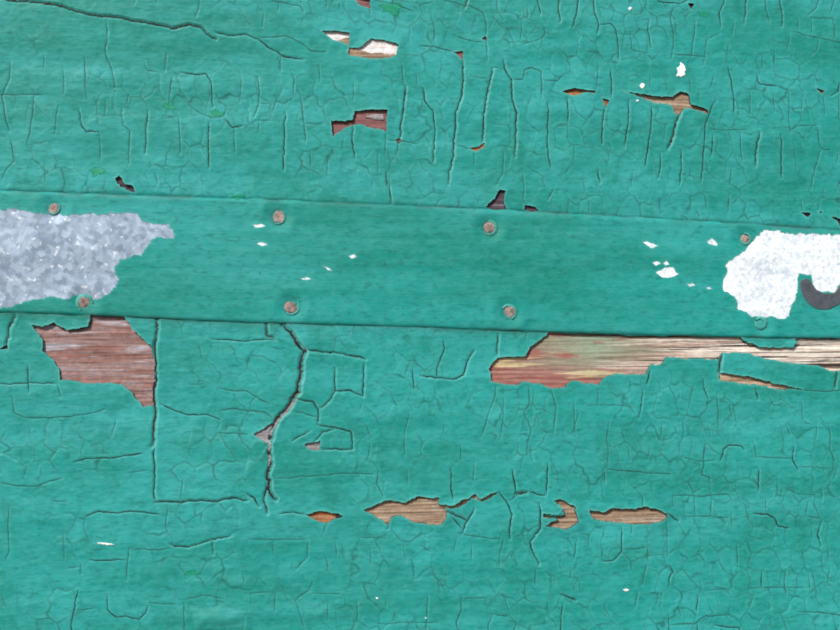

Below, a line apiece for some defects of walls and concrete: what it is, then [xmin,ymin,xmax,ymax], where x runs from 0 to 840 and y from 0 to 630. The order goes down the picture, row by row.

crack [7,0,329,170]
peeling [322,30,399,59]
crack [375,0,840,209]
peeling [0,208,174,308]
peeling [723,217,840,319]
peeling [31,315,155,407]
crack [412,342,473,387]
peeling [489,332,840,390]
crack [70,320,389,575]
peeling [364,492,497,525]
crack [449,447,548,581]
crack [71,591,219,630]